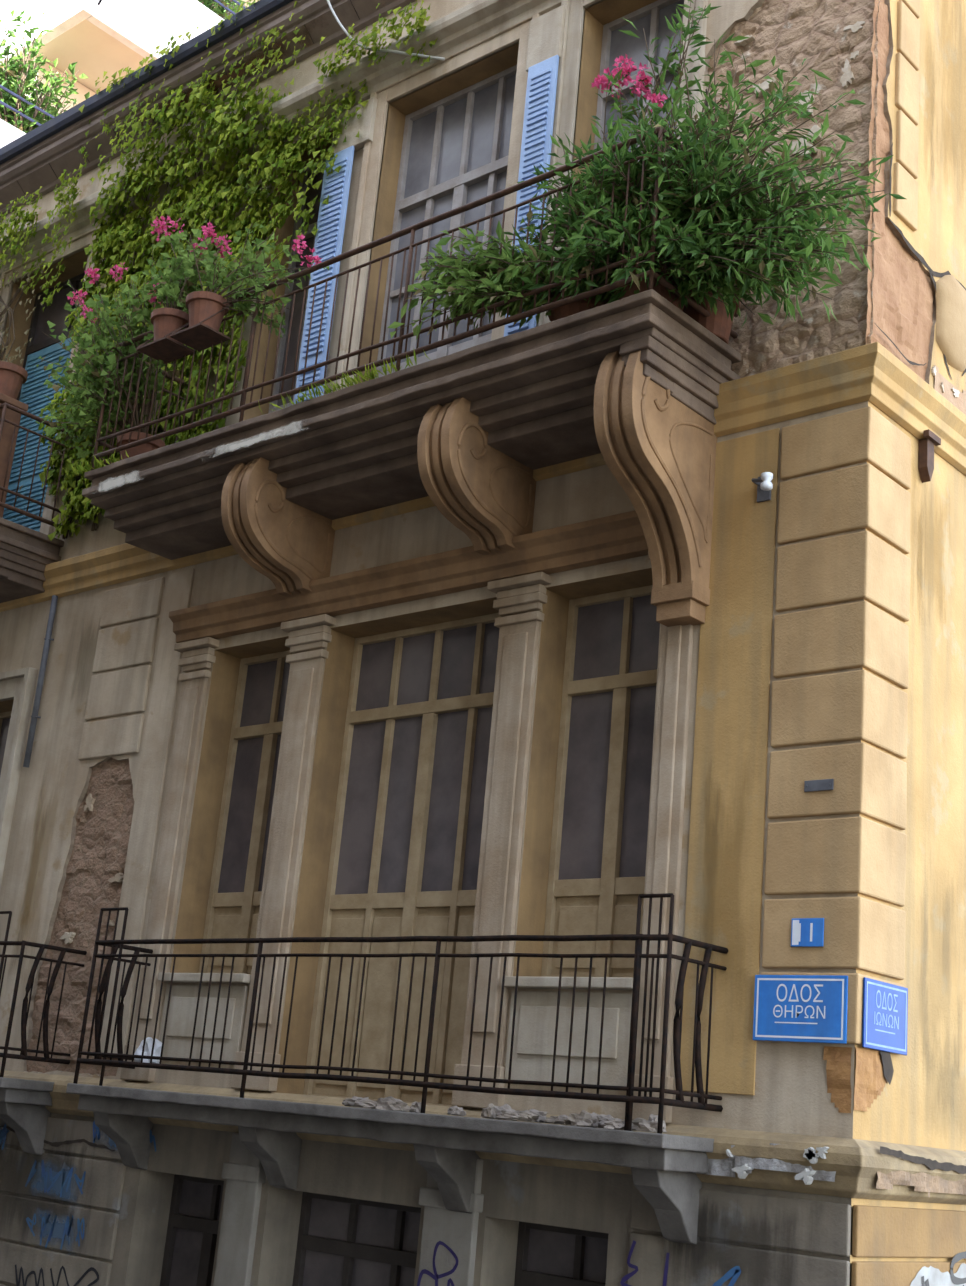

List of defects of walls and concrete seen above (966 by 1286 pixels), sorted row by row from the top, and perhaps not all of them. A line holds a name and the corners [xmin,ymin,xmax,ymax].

flaking render [708,0,966,415]
flaking render [26,758,135,1077]
spalling [823,1046,894,1113]
spalling [693,1143,836,1185]
spalling [876,1146,966,1197]